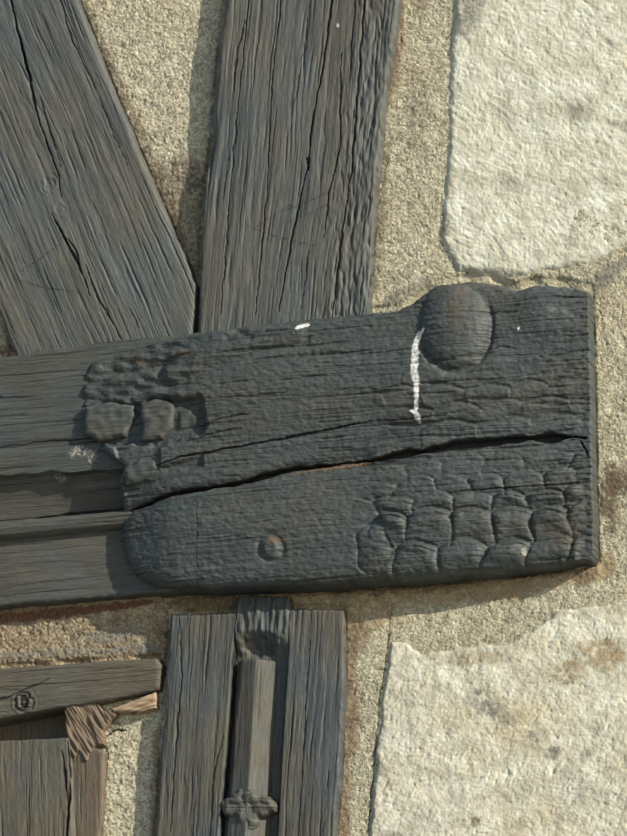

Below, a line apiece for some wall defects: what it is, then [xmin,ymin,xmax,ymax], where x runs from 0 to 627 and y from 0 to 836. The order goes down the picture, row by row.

crack [10,0,62,197]
crack [279,0,366,318]
crack [52,215,121,338]
crack [36,434,593,578]
crack [61,743,71,836]